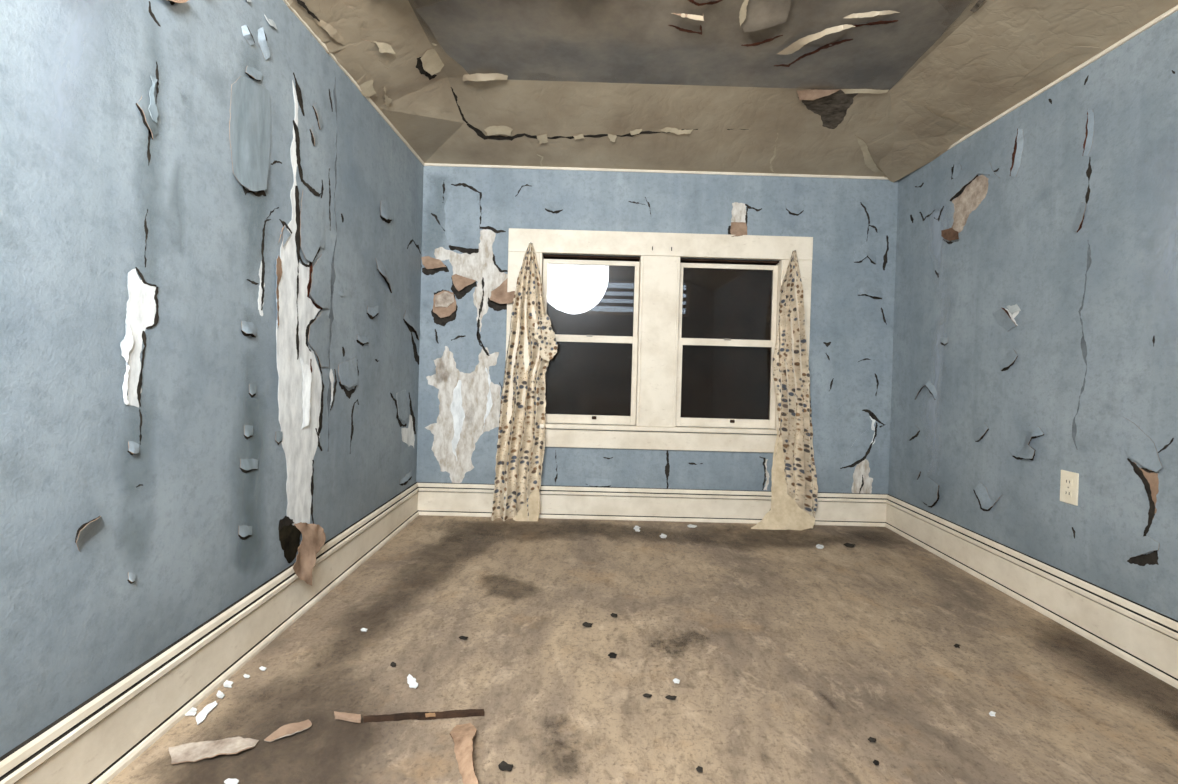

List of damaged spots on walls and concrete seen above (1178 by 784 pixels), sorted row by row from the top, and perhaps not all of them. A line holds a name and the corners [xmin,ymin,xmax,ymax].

peeling [241,14,277,81]
peeling [373,41,395,54]
peeling [416,43,444,80]
peeling [463,73,508,81]
peeling [668,0,723,35]
peeling [774,10,900,67]
crack [451,87,698,167]
peeling [941,128,1024,244]
flaking render [120,267,159,455]
flaking render [271,73,369,586]
flaking render [390,183,515,483]
peeling [1121,417,1174,566]